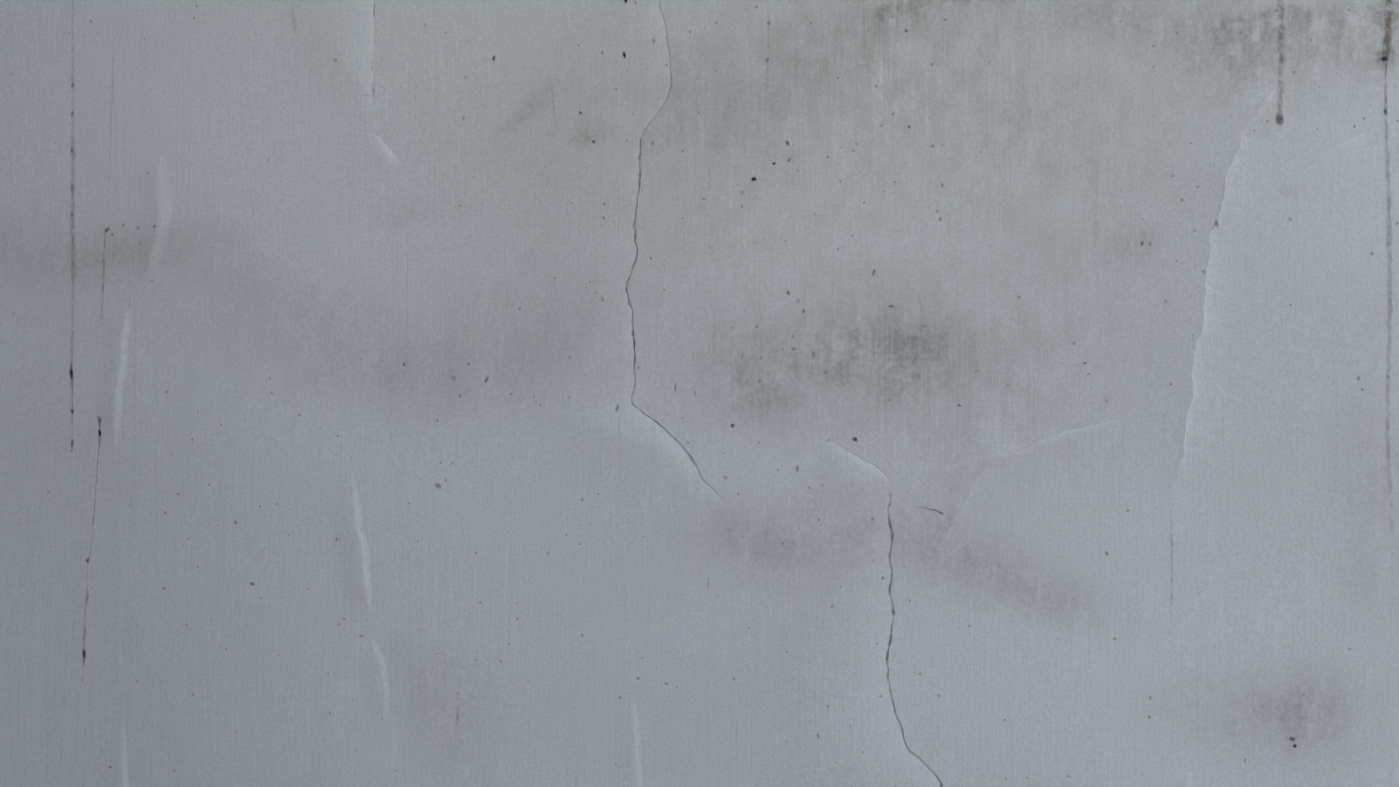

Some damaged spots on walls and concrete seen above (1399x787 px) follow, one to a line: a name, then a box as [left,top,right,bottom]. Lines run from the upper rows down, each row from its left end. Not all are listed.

crack [499,0,724,515]
crack [742,436,958,787]